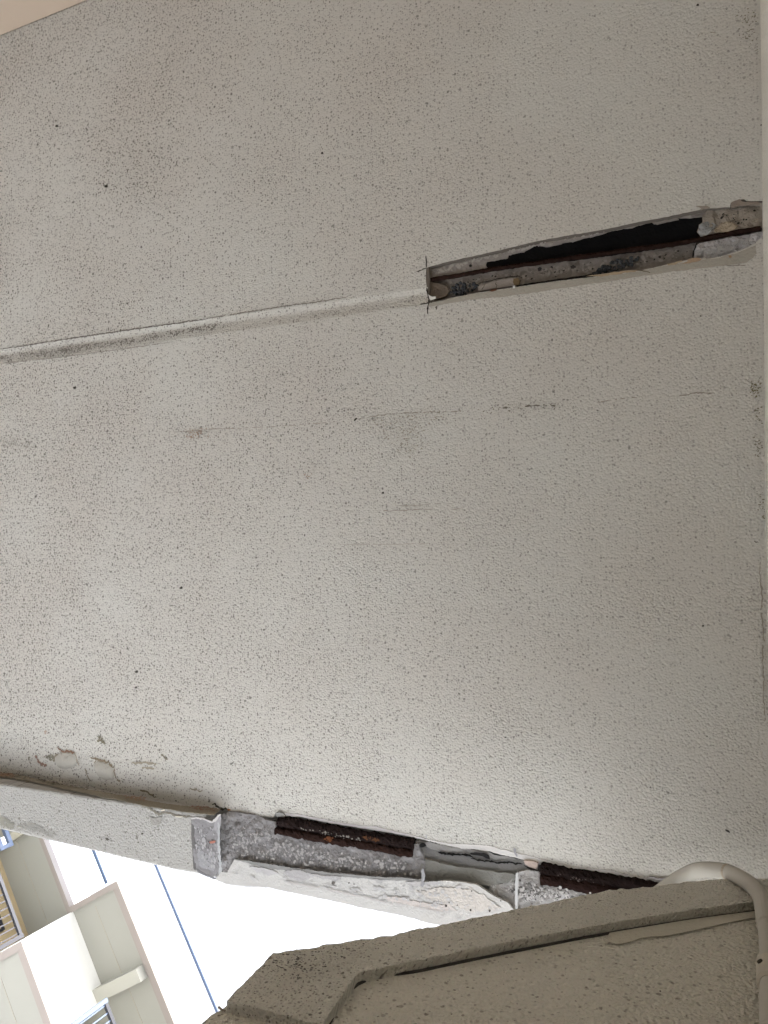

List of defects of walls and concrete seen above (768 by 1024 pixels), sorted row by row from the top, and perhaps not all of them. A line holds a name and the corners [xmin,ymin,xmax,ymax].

spalling [426,199,763,309]
crack [3,297,346,364]
crack [34,747,227,818]
spalling [161,809,666,925]